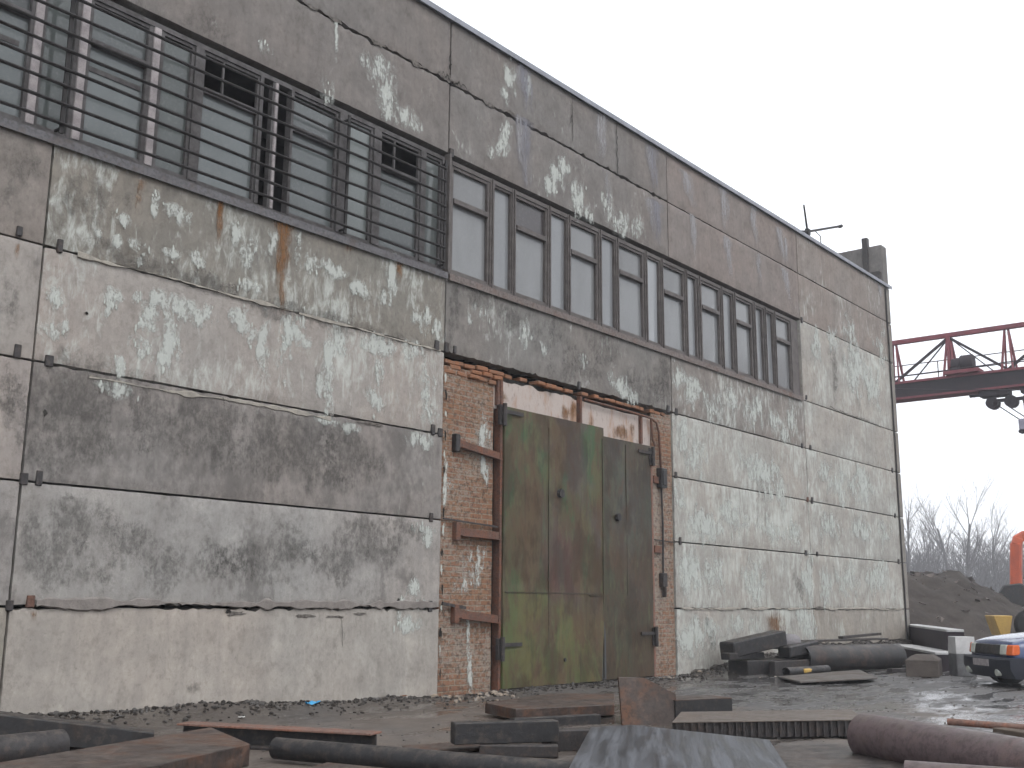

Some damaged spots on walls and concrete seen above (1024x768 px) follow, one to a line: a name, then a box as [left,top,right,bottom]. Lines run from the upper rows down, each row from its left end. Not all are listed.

peeling [361,39,423,131]
crack [443,51,469,92]
peeling [483,56,534,159]
peeling [151,189,190,223]
peeling [545,156,641,237]
peeling [232,221,278,292]
rust [276,221,294,302]
peeling [296,233,368,297]
peeling [381,260,400,306]
peeling [104,286,213,374]
peeling [97,355,139,401]
spalling [280,306,797,479]